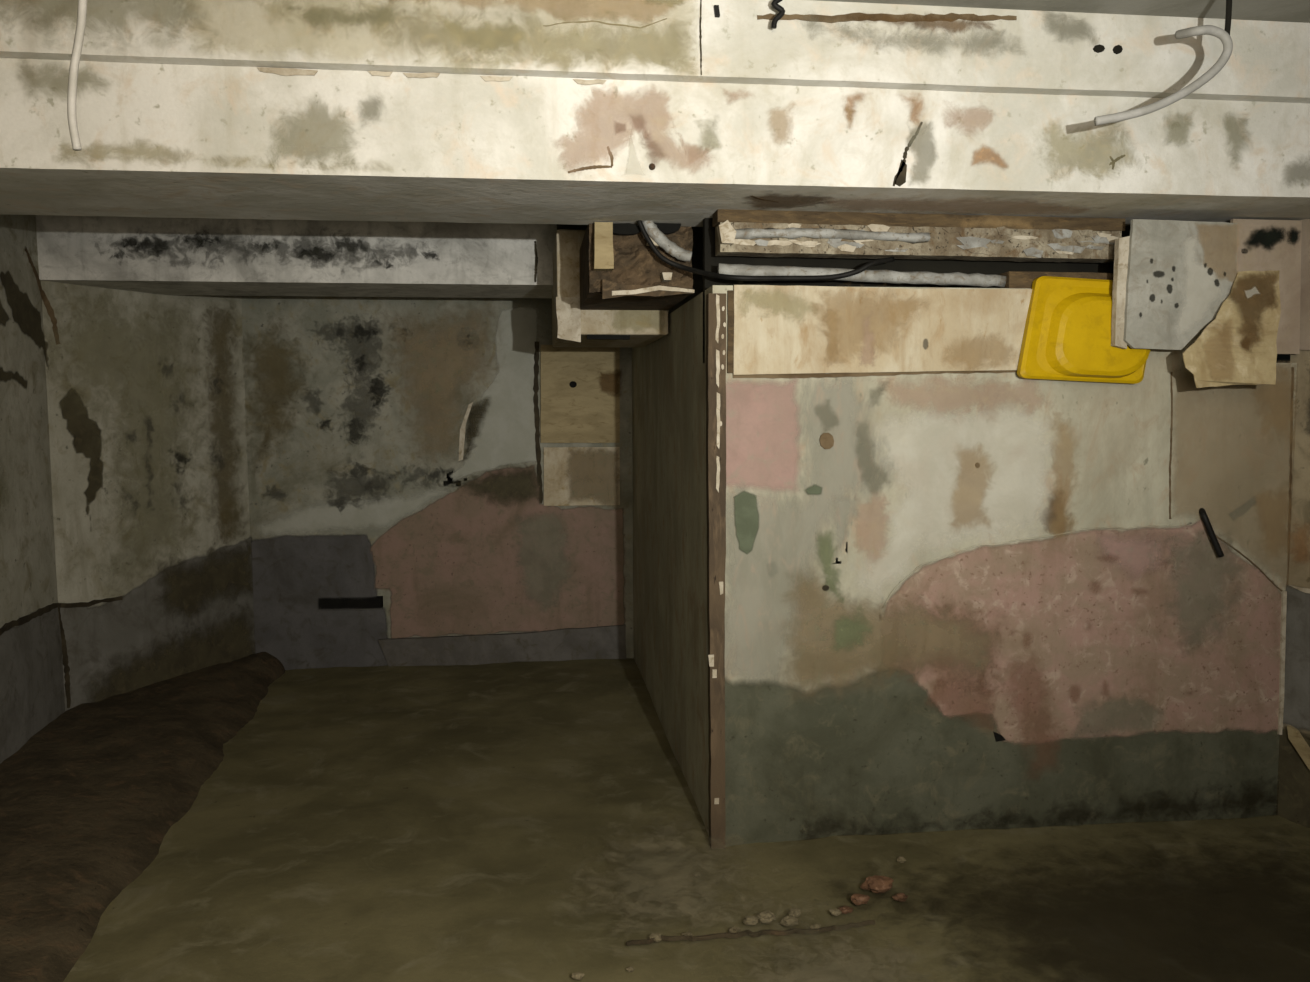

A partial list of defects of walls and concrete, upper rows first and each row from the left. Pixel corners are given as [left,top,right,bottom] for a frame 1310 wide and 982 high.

mould [114,234,219,258]
mould [295,239,393,268]
spalling [579,222,694,310]
peeling [717,220,923,252]
peeling [942,226,1118,258]
peeling [0,271,48,366]
water stain [355,355,389,406]
peeling [60,389,103,514]
peeling [261,307,625,639]
peeling [715,294,1310,744]
crack [0,596,123,708]
water stain [725,668,1310,846]